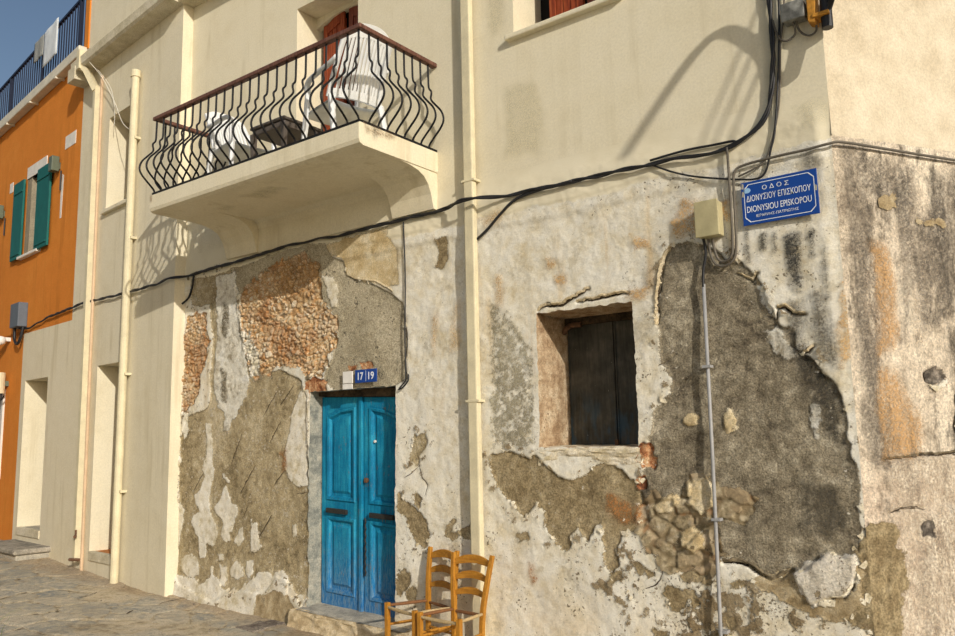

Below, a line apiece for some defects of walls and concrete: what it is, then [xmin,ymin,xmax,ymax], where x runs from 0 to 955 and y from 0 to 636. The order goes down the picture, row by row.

flaking render [172,226,407,624]
peeling [395,568,417,608]
peeling [434,236,448,269]
crack [537,286,629,311]
flaking render [482,234,911,636]
damp [745,229,842,440]
damp [853,224,891,464]
damp [860,153,955,342]
crack [890,505,925,513]
crack [883,399,955,460]